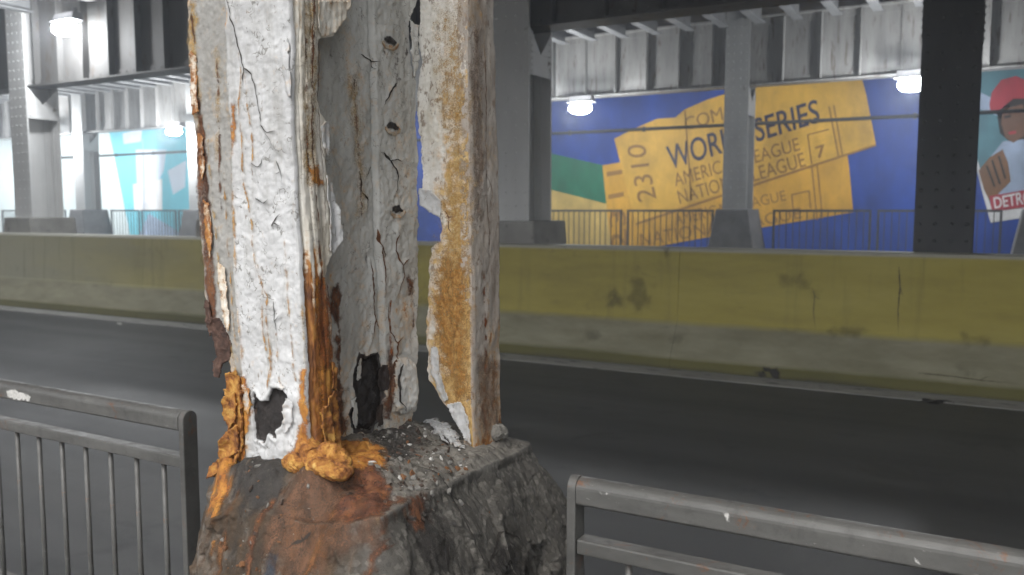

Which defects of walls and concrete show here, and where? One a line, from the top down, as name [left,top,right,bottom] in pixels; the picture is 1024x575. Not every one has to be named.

peeling [189,51,199,115]
peeling [197,133,205,180]
peeling [203,200,230,336]
crack [227,2,282,180]
crack [311,0,328,348]
crack [359,153,409,366]
corrosion [430,7,500,437]
corrosion [206,368,250,519]
peeling [241,384,253,414]
peeling [269,382,293,434]
corrosion [288,241,348,454]
corrosion [245,465,427,575]